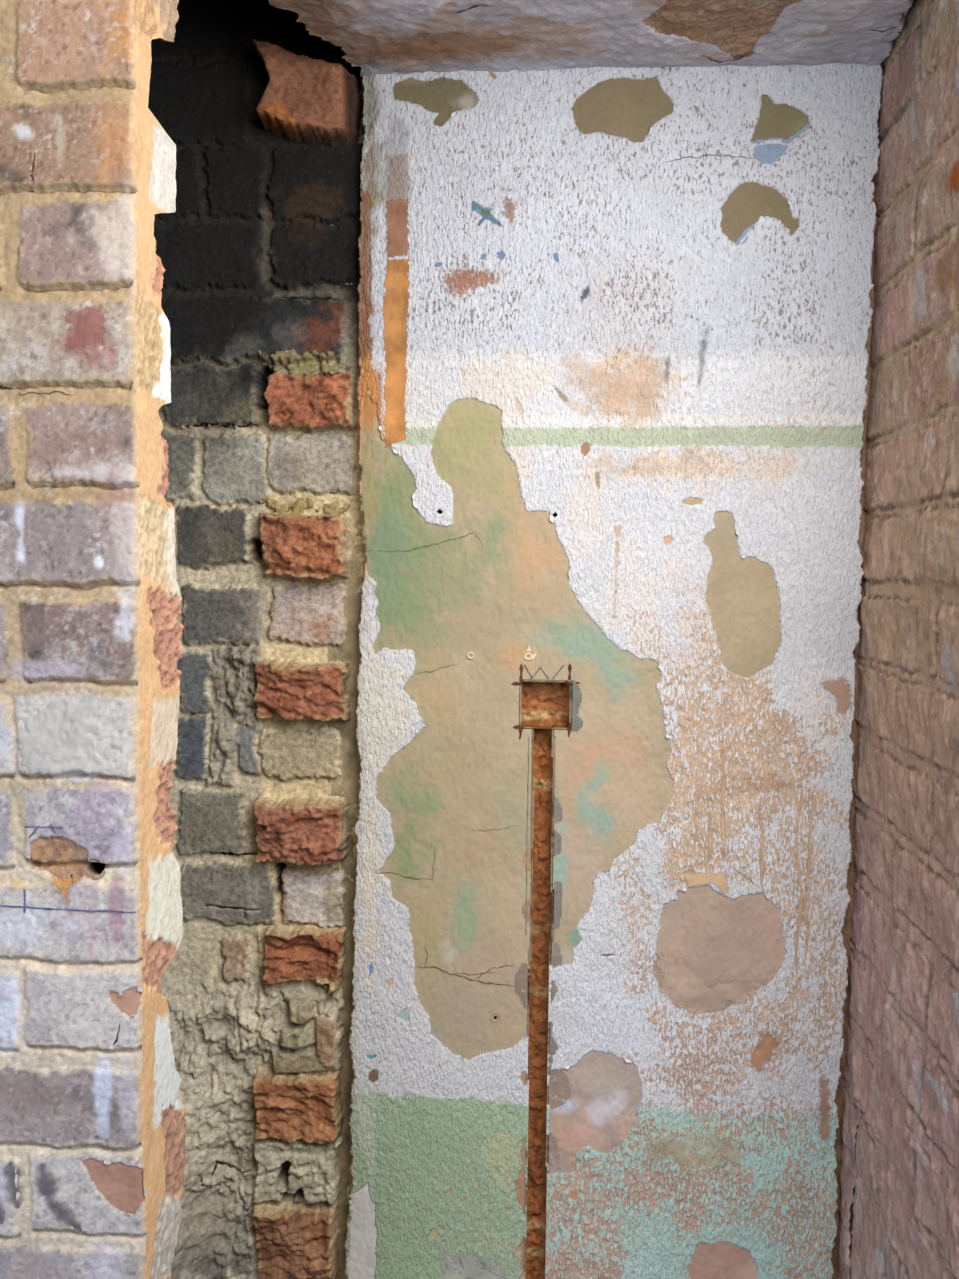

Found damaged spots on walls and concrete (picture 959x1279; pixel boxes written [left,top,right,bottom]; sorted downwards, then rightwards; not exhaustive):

flaking render [643,0,801,58]
peeling [393,75,478,128]
peeling [570,77,673,142]
peeling [751,93,810,164]
peeling [721,182,799,246]
peeling [682,497,702,505]
peeling [704,512,783,678]
peeling [359,396,673,1059]
peeling [653,871,786,1013]
peeling [548,1022,642,1174]
peeling [688,1241,758,1279]